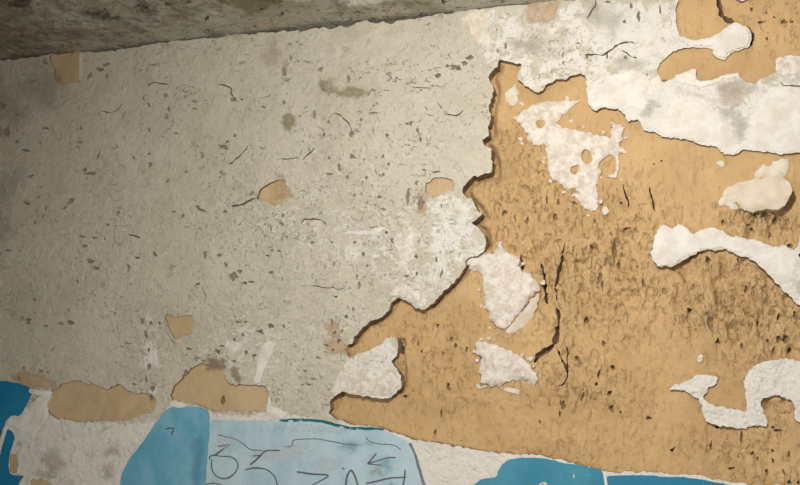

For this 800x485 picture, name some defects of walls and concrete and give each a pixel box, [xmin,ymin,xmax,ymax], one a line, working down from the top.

flaking render [43,52,111,85]
water stain [220,0,281,14]
flaking render [434,55,474,78]
flaking render [646,0,800,84]
crack [716,0,755,46]
flaking render [259,180,287,231]
flaking render [332,62,800,485]
flaking render [141,314,194,352]
crack [519,244,569,386]
flaking render [171,360,272,413]
flaking render [0,363,157,473]